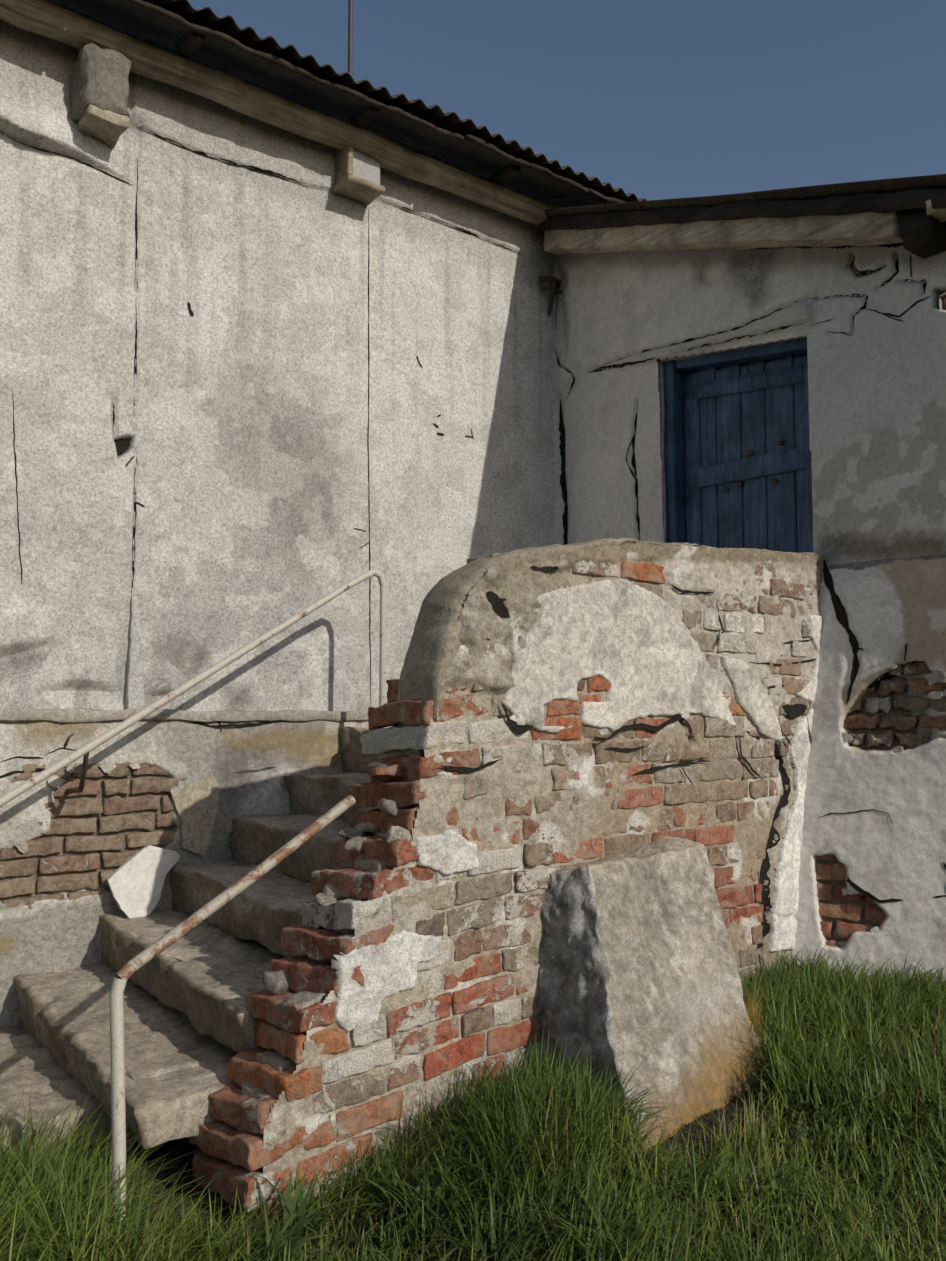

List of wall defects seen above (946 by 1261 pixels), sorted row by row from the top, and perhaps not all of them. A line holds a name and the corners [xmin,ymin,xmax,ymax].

crack [1,128,309,426]
crack [13,401,22,583]
flaking render [112,402,131,456]
crack [125,456,145,596]
crack [354,203,521,698]
crack [555,255,933,545]
crack [668,583,724,649]
crack [822,555,946,720]
flaking render [839,576,946,753]
flaking render [0,762,220,913]
flaking render [502,578,823,952]
flaking render [815,855,887,947]